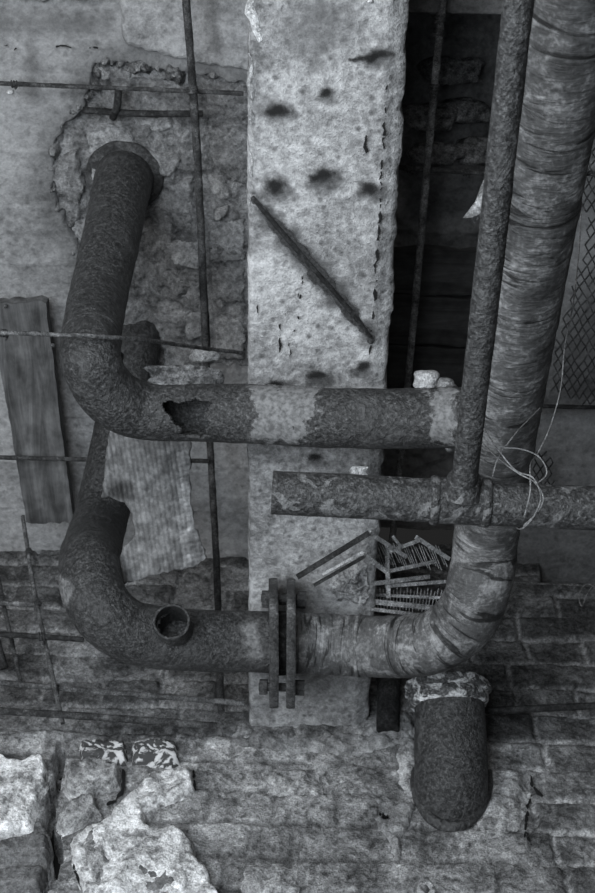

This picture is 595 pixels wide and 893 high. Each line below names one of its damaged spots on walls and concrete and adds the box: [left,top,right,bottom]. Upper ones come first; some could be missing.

spalling [245,0,263,42]
spalling [47,53,255,366]
flaking render [0,754,49,841]
flaking render [70,767,218,893]
crack [524,775,543,845]